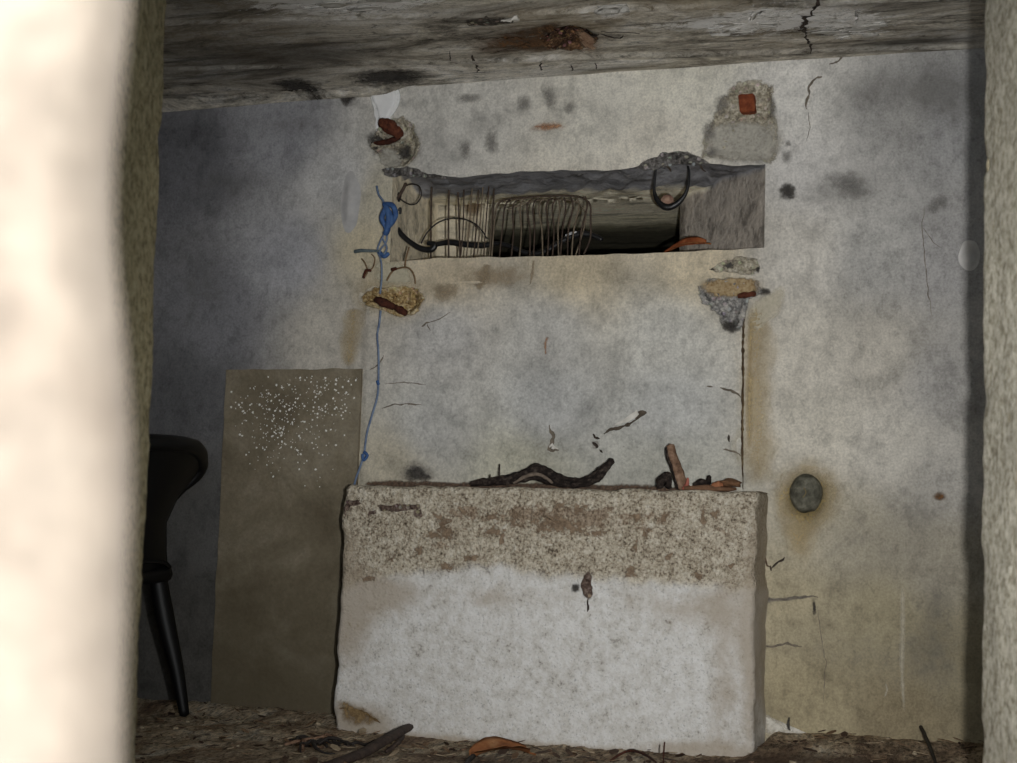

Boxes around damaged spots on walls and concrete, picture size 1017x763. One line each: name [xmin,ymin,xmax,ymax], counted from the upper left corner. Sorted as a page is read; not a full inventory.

crack [798,0,843,140]
spalling [368,116,445,179]
spalling [637,80,780,172]
spalling [361,285,425,317]
spalling [698,256,770,333]